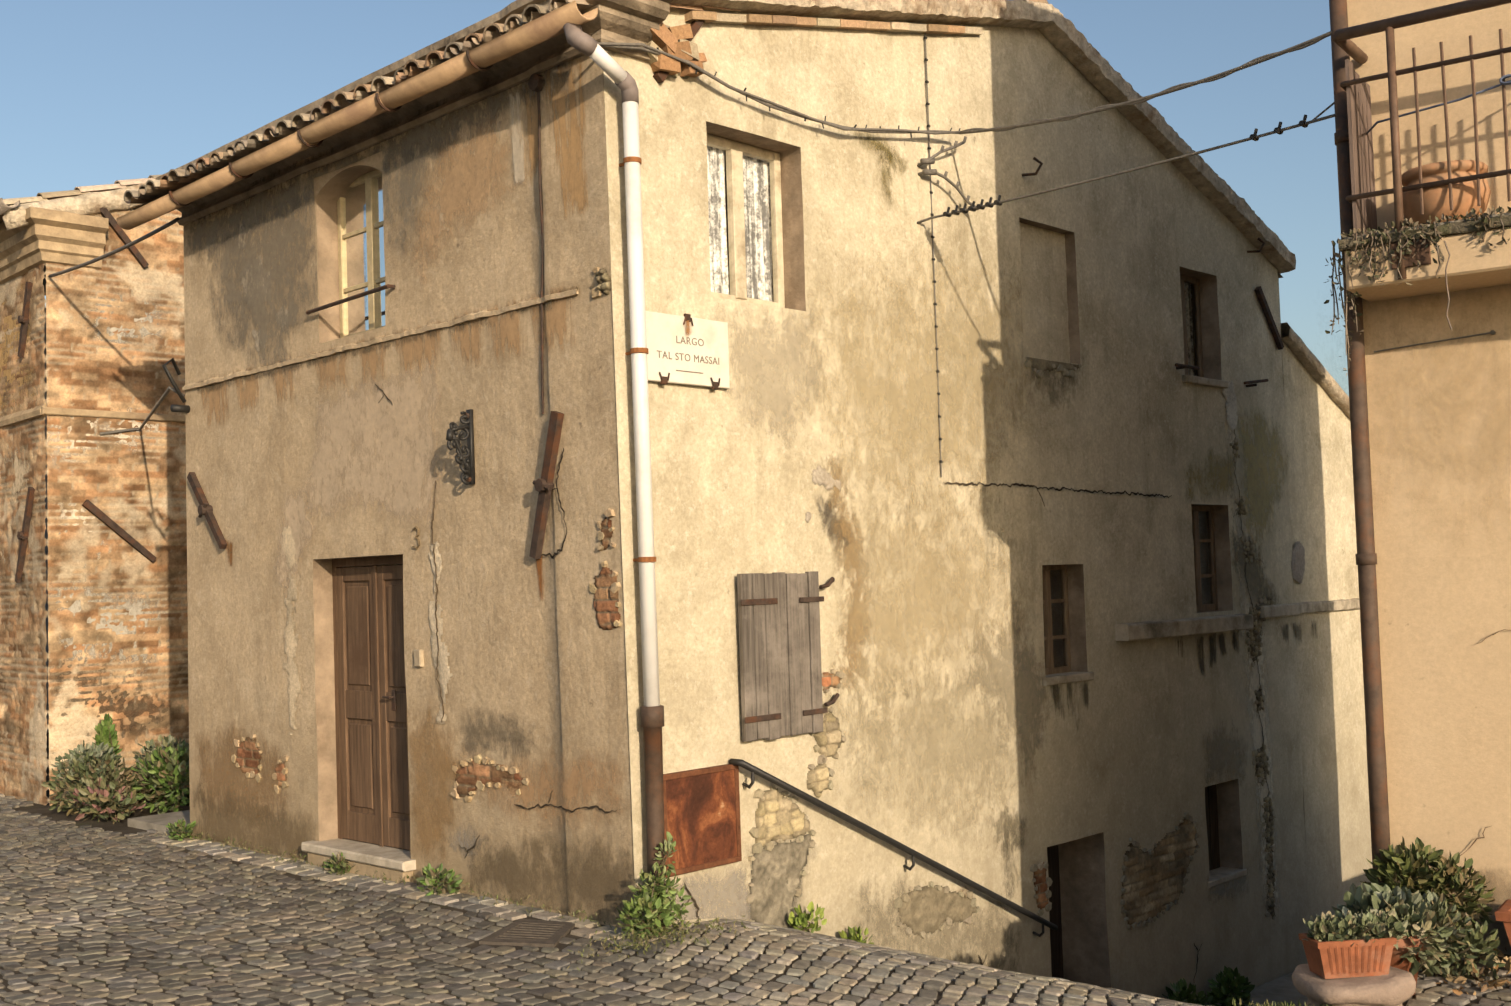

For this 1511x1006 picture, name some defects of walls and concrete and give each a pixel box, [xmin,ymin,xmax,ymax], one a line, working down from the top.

crack [945,482,1172,506]
flaking render [589,508,622,630]
damp [1197,633,1239,672]
peeling [199,728,289,817]
flaking render [450,754,530,802]
crack [514,791,618,813]
spalling [745,669,847,928]
flaking render [1030,861,1053,916]
flaking render [1119,812,1200,930]